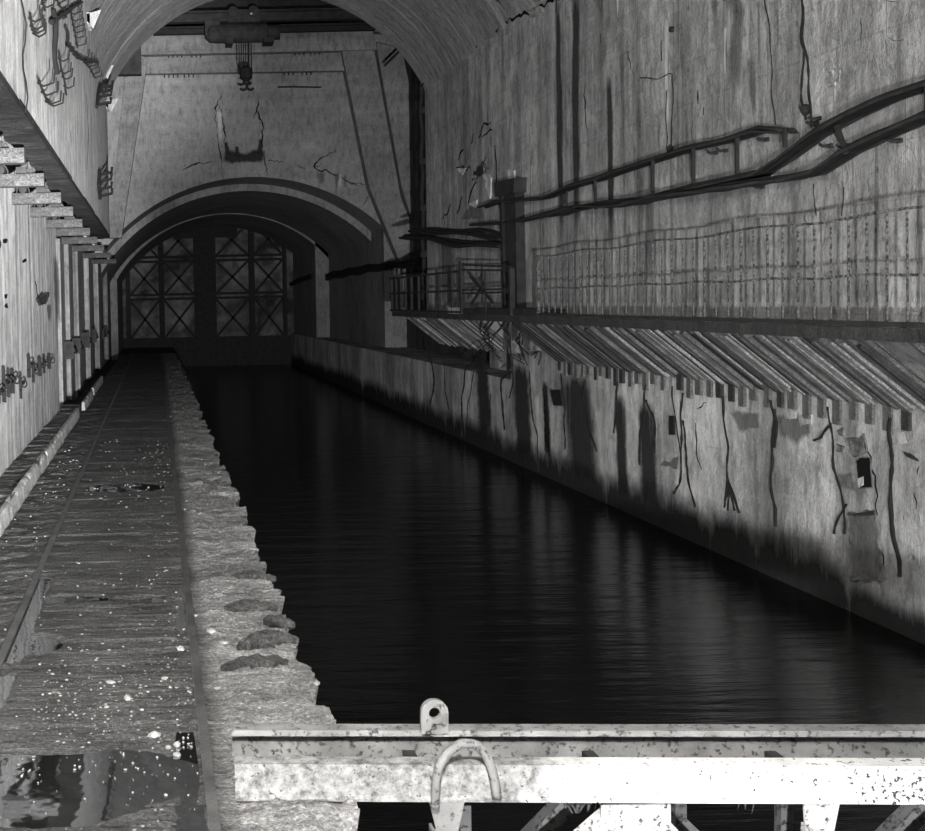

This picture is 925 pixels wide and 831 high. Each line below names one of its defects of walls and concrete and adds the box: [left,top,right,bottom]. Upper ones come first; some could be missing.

crack [476,0,559,48]
crack [182,93,369,205]
spalling [836,427,887,583]